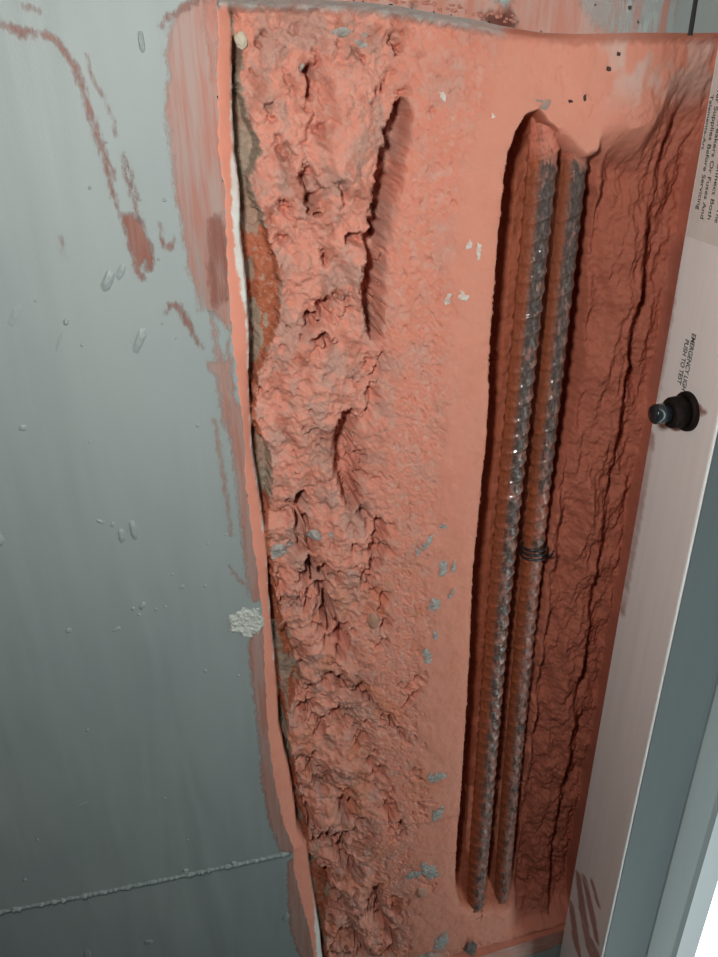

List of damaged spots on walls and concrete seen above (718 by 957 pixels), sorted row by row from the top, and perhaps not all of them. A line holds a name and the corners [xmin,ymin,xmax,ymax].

spalling [216,0,718,957]